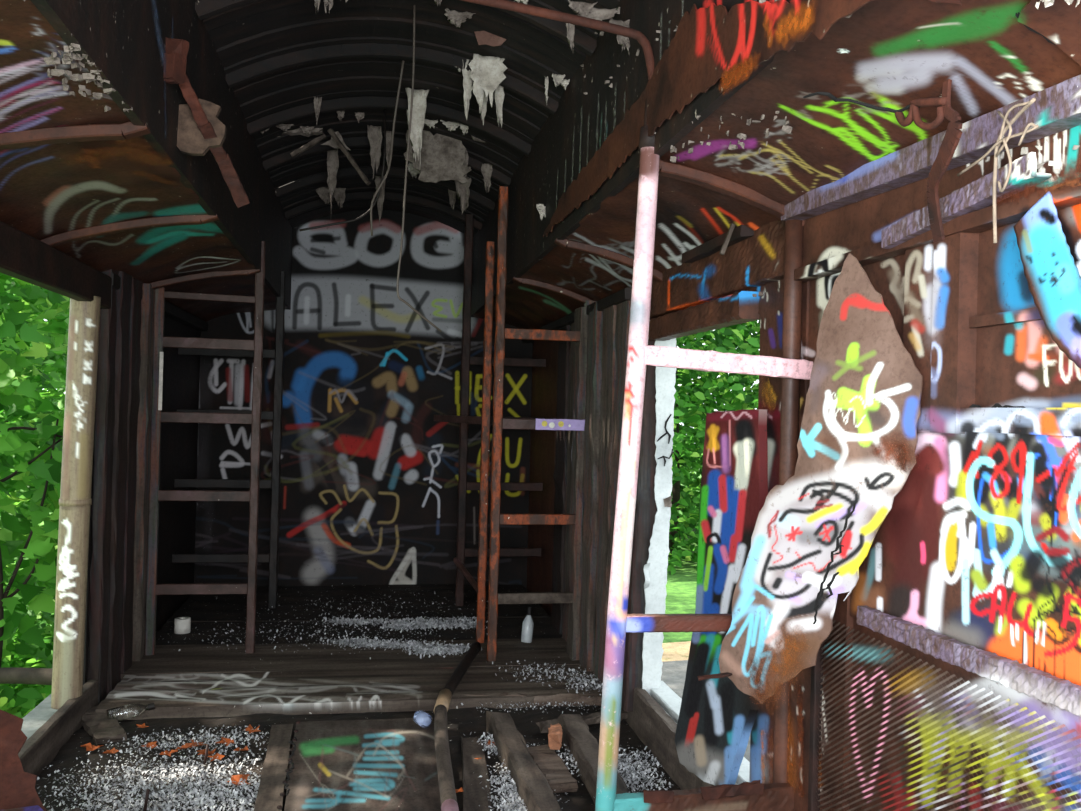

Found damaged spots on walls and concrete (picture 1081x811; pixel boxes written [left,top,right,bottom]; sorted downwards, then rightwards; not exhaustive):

peeling [314,0,348,13]
peeling [434,0,476,28]
peeling [566,0,640,56]
peeling [261,97,322,134]
peeling [405,54,507,178]
peeling [545,73,570,105]
peeling [316,149,346,208]
peeling [336,110,392,225]
peeling [448,150,493,214]